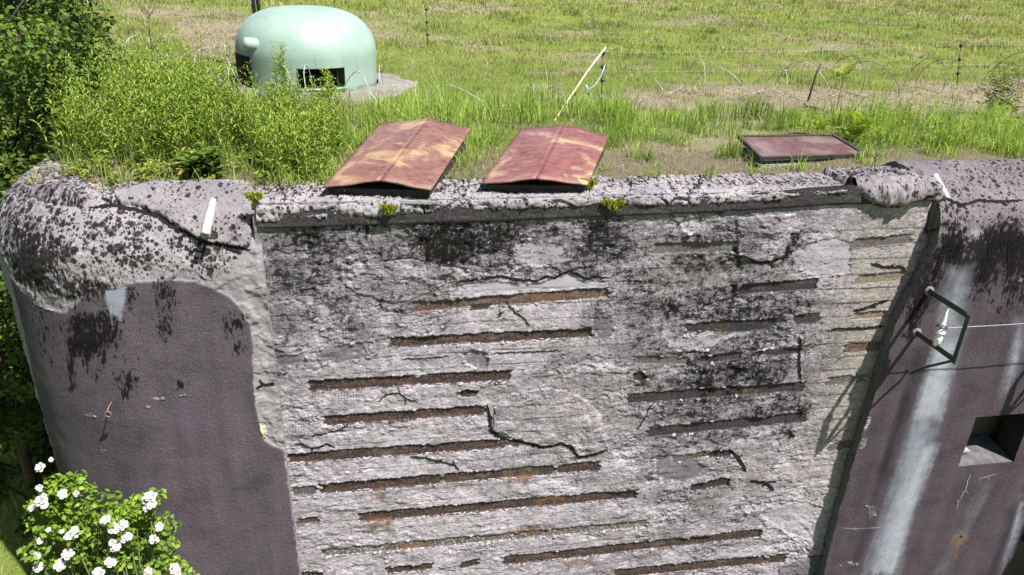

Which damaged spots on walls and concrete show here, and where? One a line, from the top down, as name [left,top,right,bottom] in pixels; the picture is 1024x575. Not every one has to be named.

leakage [66,287,134,391]
crack [89,197,287,389]
crack [456,264,612,326]
crack [487,405,604,459]
leakage [870,245,964,572]